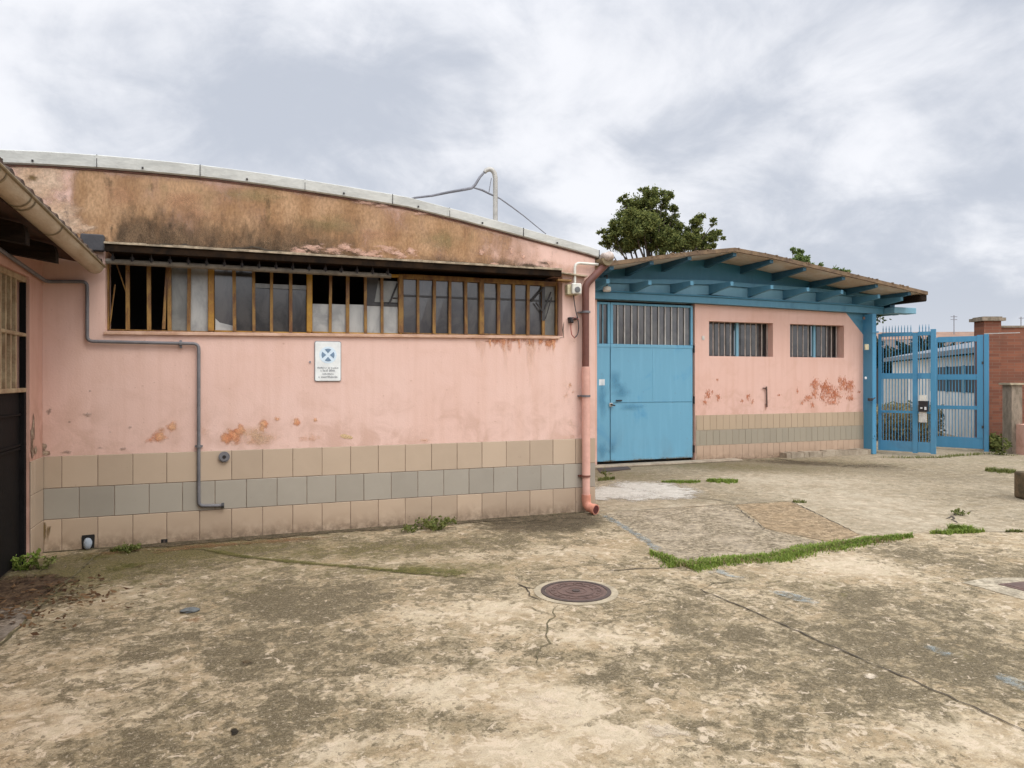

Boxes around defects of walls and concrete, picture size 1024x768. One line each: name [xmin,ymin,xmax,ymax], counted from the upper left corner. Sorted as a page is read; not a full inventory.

leakage [72,170,548,267]
peeling [292,244,422,260]
corrosion [489,338,556,349]
peeling [797,377,861,407]
peeling [221,418,279,443]